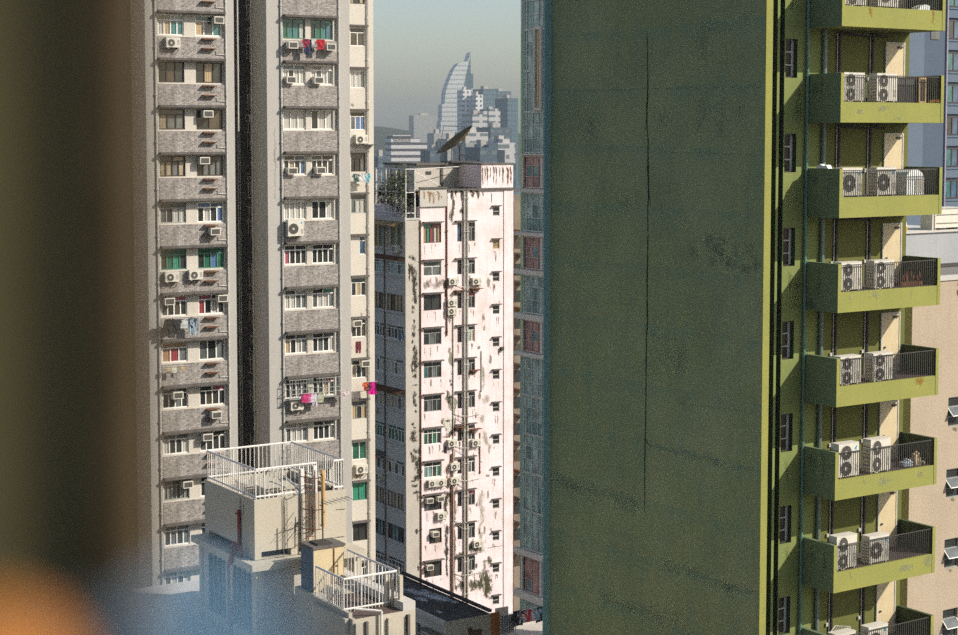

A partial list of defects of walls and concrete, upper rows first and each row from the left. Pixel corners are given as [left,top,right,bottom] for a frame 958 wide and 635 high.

leakage [408,245,498,500]
leakage [449,166,504,221]
crack [643,37,651,512]
leakage [380,492,498,613]